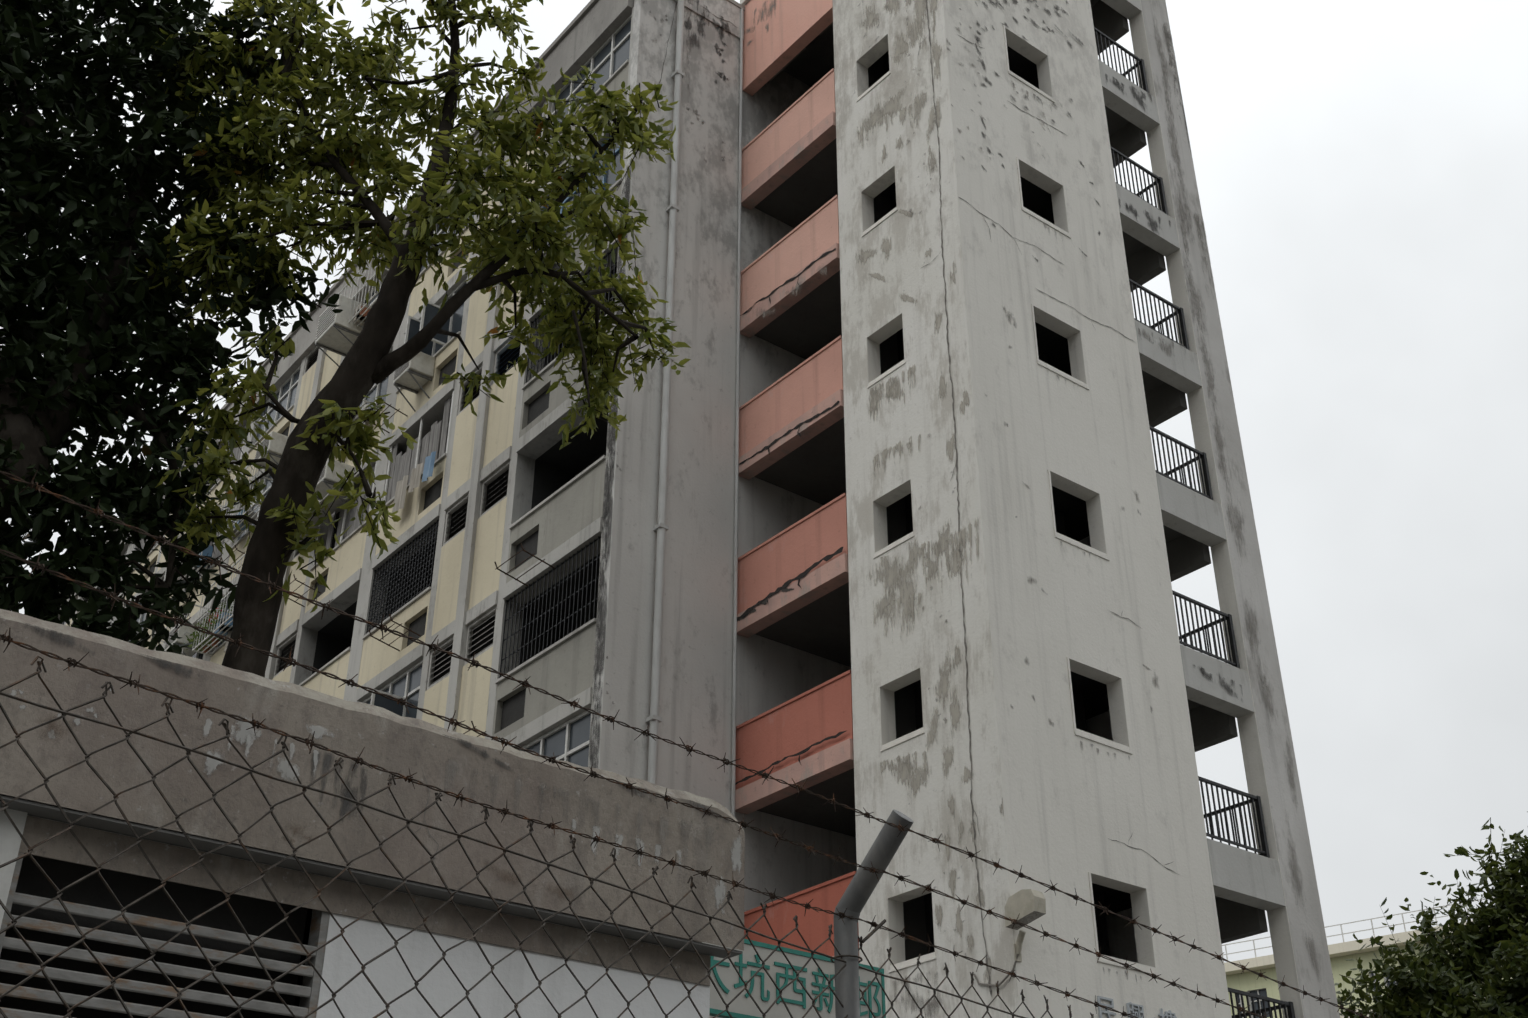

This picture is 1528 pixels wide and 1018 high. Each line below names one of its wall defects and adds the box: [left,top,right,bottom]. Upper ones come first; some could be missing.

crack [917,0,1136,997]
crack [1108,836,1177,874]